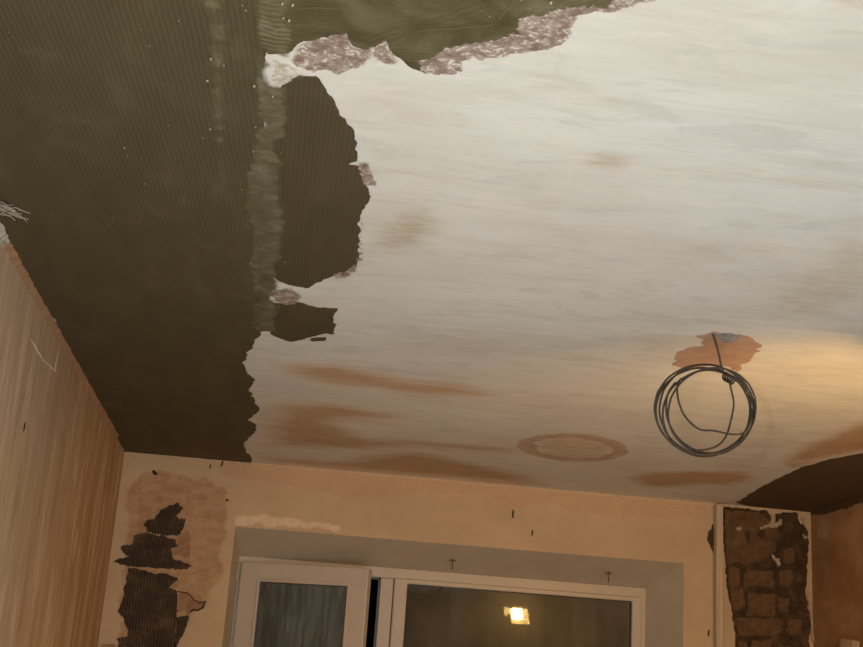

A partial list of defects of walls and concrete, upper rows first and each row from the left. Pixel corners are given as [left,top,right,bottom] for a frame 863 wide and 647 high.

spalling [0,0,654,463]
peeling [672,331,762,372]
spalling [101,472,225,647]
spalling [723,453,863,647]